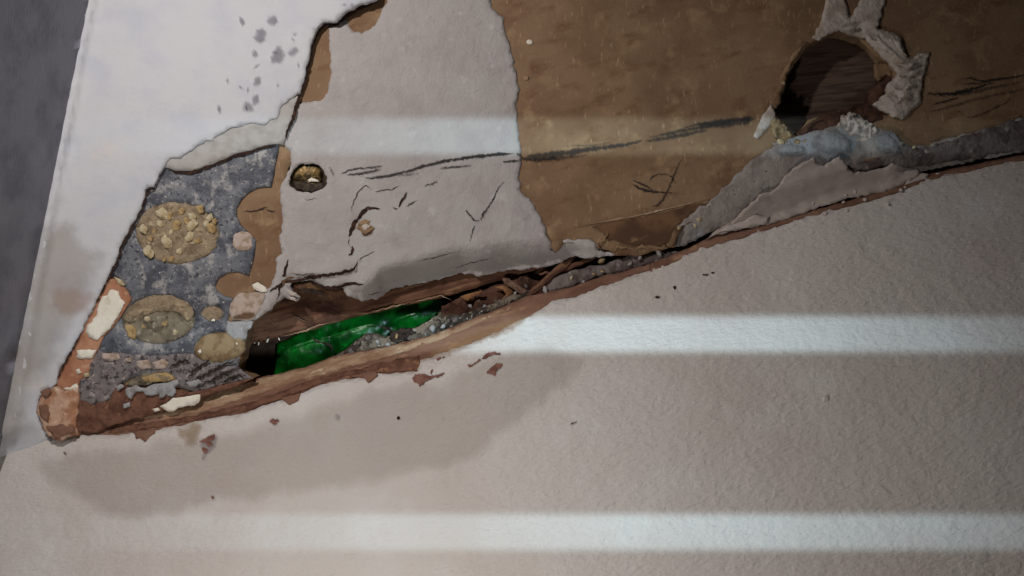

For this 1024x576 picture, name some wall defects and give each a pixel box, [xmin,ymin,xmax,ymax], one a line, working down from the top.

leakage [245,17,276,109]
spalling [753,0,931,143]
crack [270,185,417,299]
flaking render [36,155,1024,455]